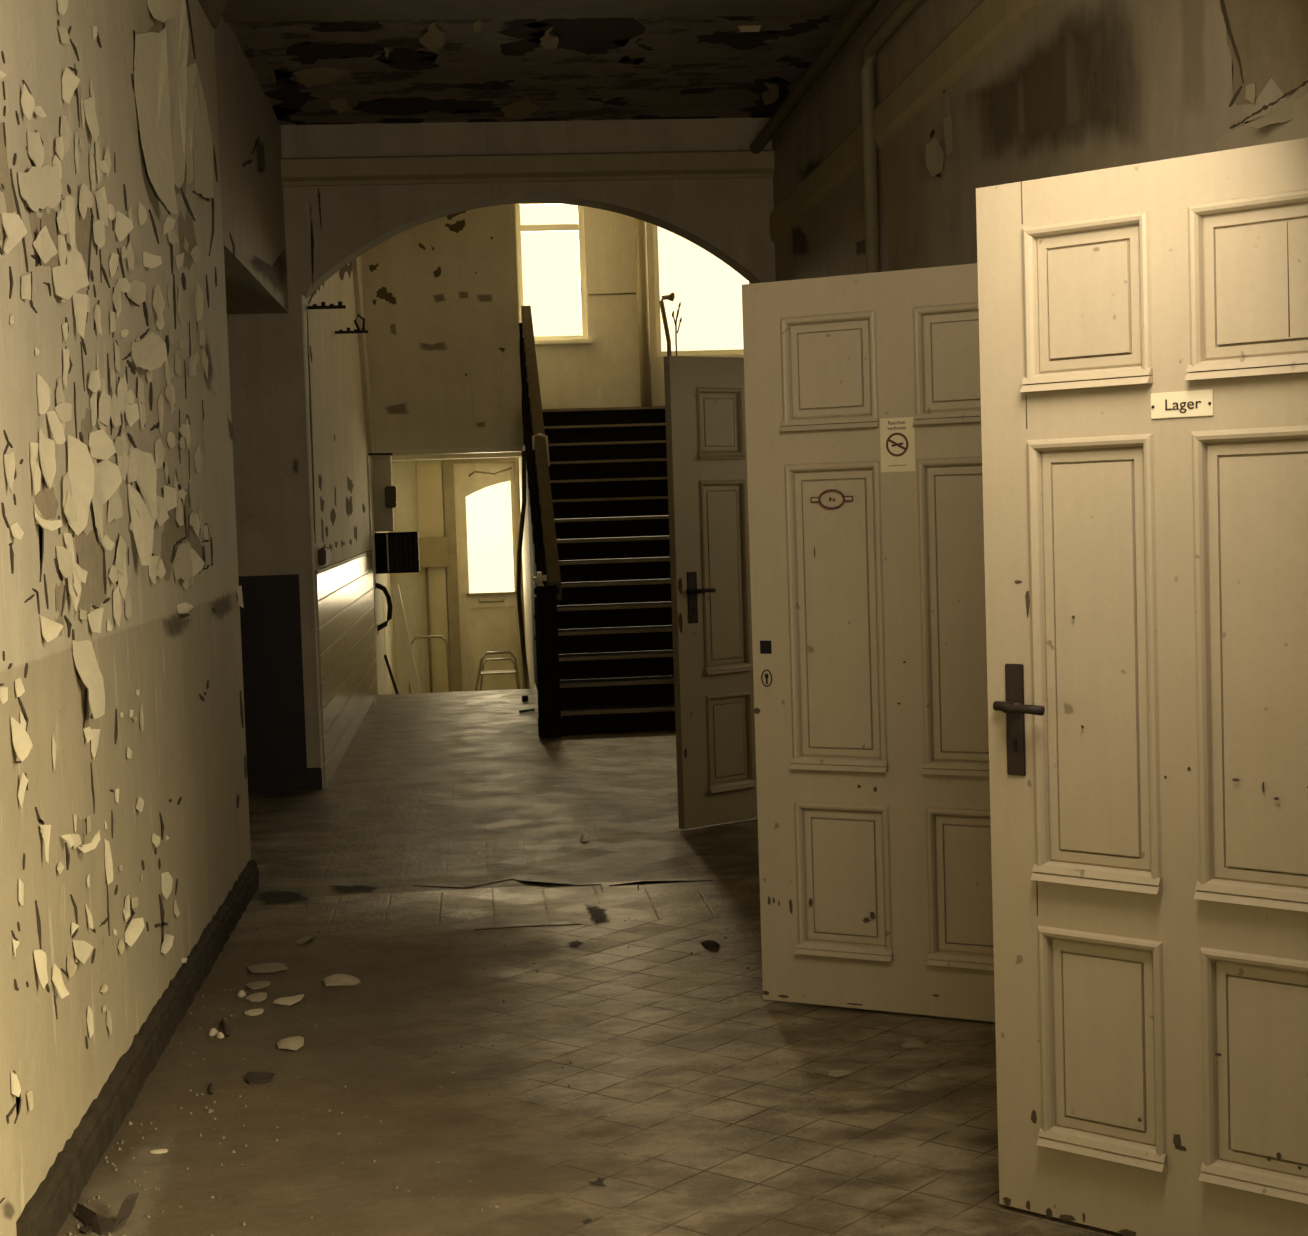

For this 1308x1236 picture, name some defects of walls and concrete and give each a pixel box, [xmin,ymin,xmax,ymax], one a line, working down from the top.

flaking render [497,18,655,65]
flaking render [695,15,831,50]
flaking render [264,21,574,125]
flaking render [738,55,811,118]
flaking render [445,211,466,233]
flaking render [372,287,397,305]
spalling [307,261,365,551]
spalling [212,586,244,616]
crack [413,878,713,892]
crack [474,923,581,931]
peeling [85,983,112,1049]
spalling [6,1070,34,1124]